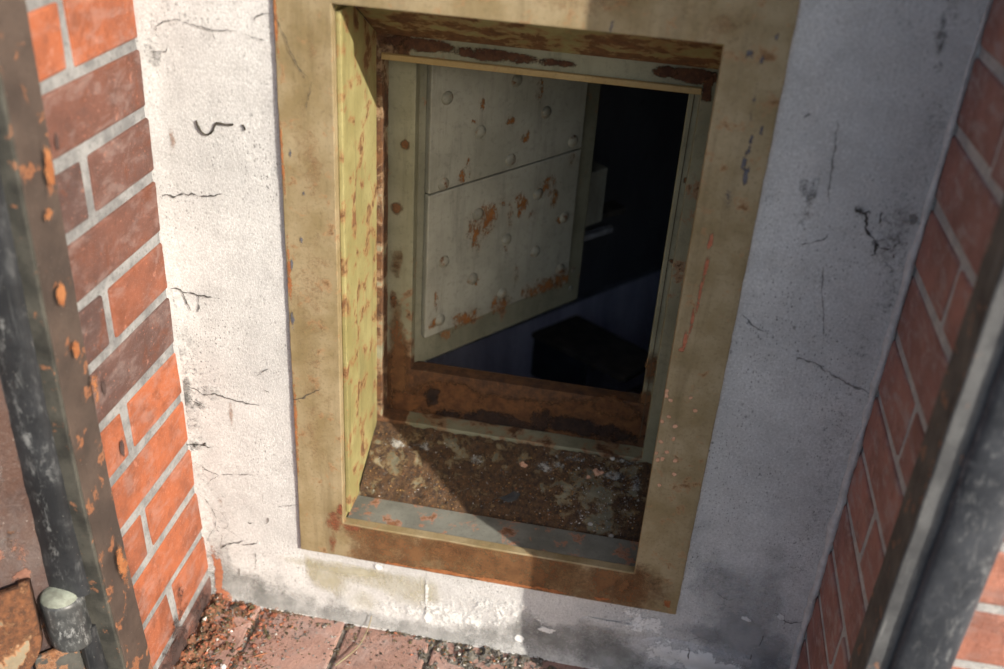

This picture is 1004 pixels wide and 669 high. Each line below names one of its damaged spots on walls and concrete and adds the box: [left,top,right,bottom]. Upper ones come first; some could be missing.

rust [383,35,576,67]
rust [652,66,718,102]
crack [855,206,900,258]
crack [172,288,220,312]
rust [387,293,409,409]
crack [191,369,268,405]
rust [423,388,638,444]
crack [186,443,292,575]
water stain [211,566,662,669]